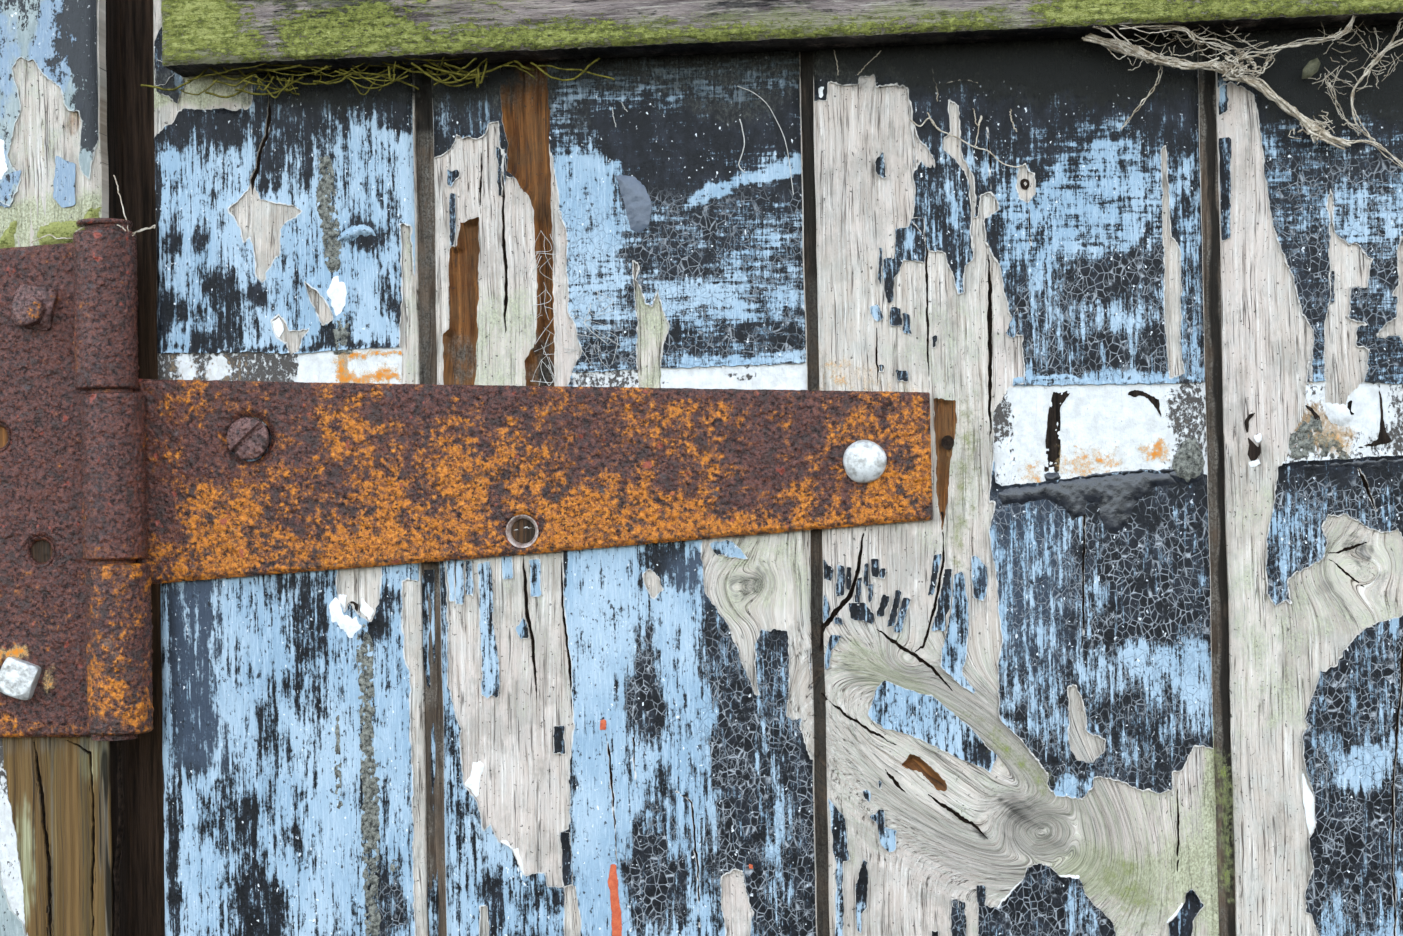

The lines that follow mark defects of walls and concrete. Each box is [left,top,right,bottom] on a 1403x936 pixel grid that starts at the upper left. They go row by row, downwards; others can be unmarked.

peeling [158,224,418,384]
corrosion [334,350,402,384]
corrosion [0,645,28,659]
peeling [329,566,381,638]
peeling [434,76,1219,936]
crack [819,529,866,651]
crack [1079,515,1087,649]
peeling [1217,83,1403,936]
crack [1329,468,1376,587]
peeling [403,579,426,936]
crack [608,737,635,847]
crack [1391,647,1403,936]